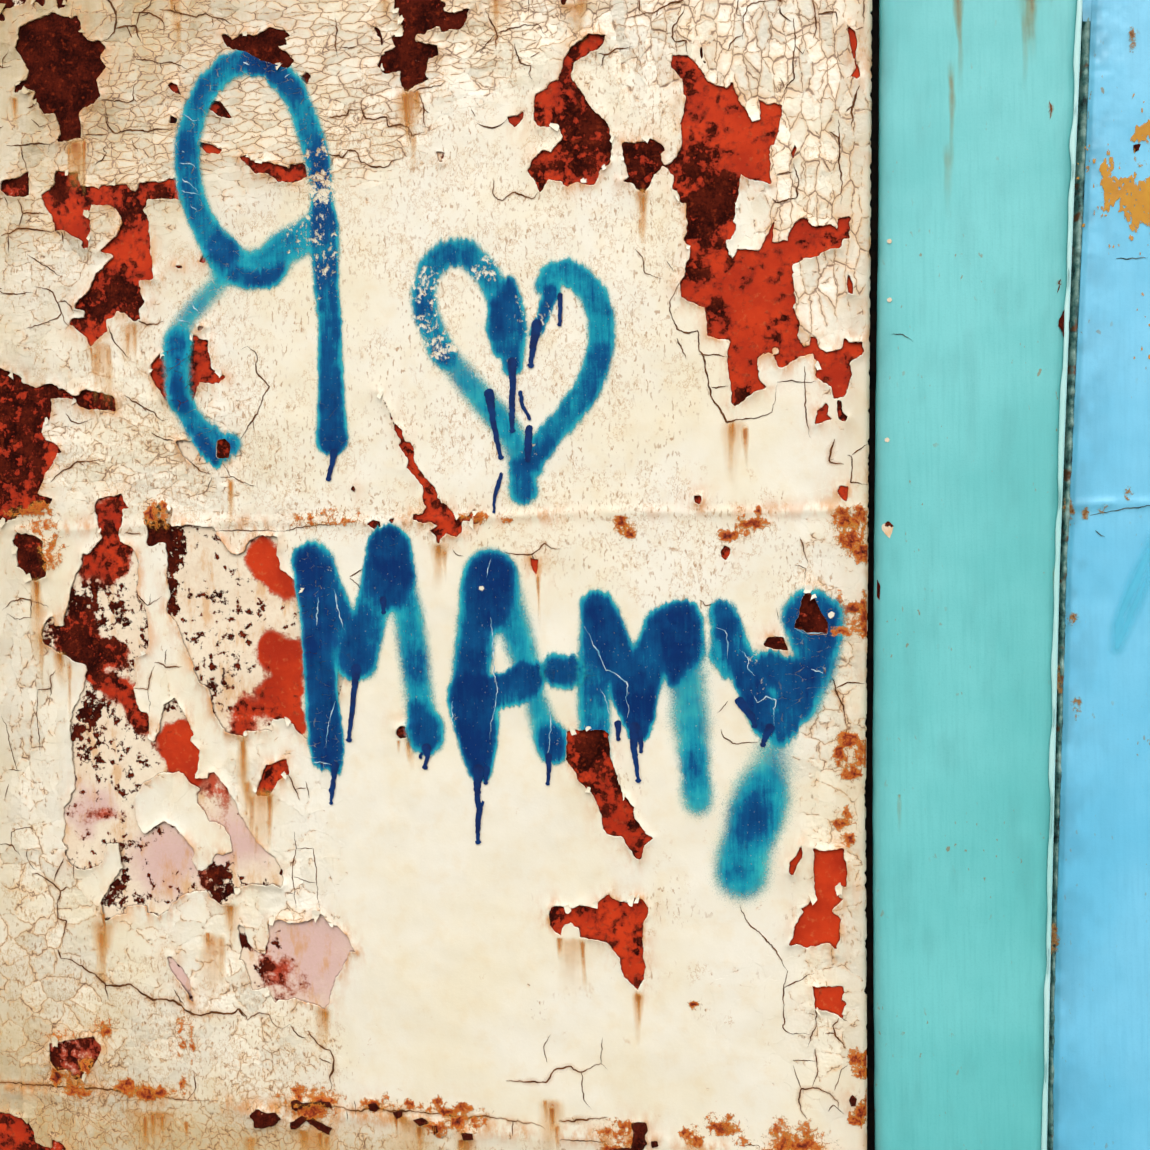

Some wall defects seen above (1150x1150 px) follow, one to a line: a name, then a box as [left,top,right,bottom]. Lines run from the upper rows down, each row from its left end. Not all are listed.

crack [85,0,233,209]
peeling [1,169,179,346]
peeling [508,34,864,424]
peeling [0,368,116,528]
crack [635,249,867,485]
peeling [41,494,289,921]
rust [247,1082,347,1146]
crack [0,827,607,1143]
rust [359,1093,494,1150]
rust [593,1117,658,1150]
rust [678,1112,828,1150]
crack [740,907,848,1119]